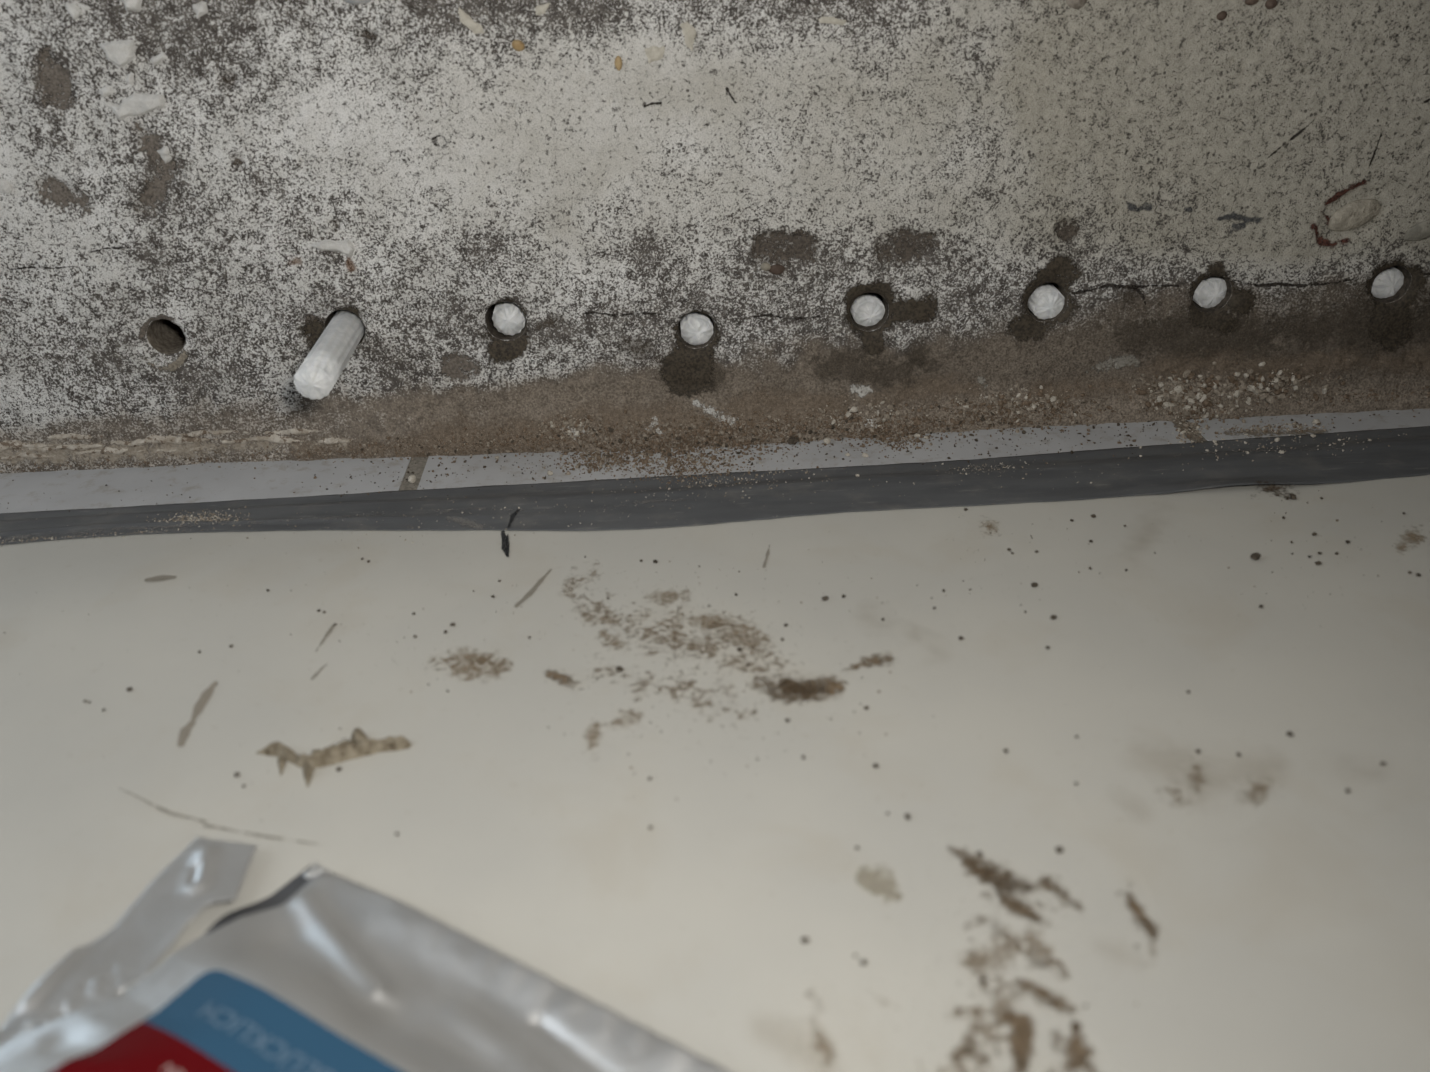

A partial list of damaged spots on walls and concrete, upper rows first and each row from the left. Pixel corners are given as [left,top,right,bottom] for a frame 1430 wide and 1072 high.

water stain [294,281,988,458]
water stain [1006,254,1082,342]
crack [1072,283,1179,303]
water stain [1034,259,1430,400]
crack [1234,279,1353,288]